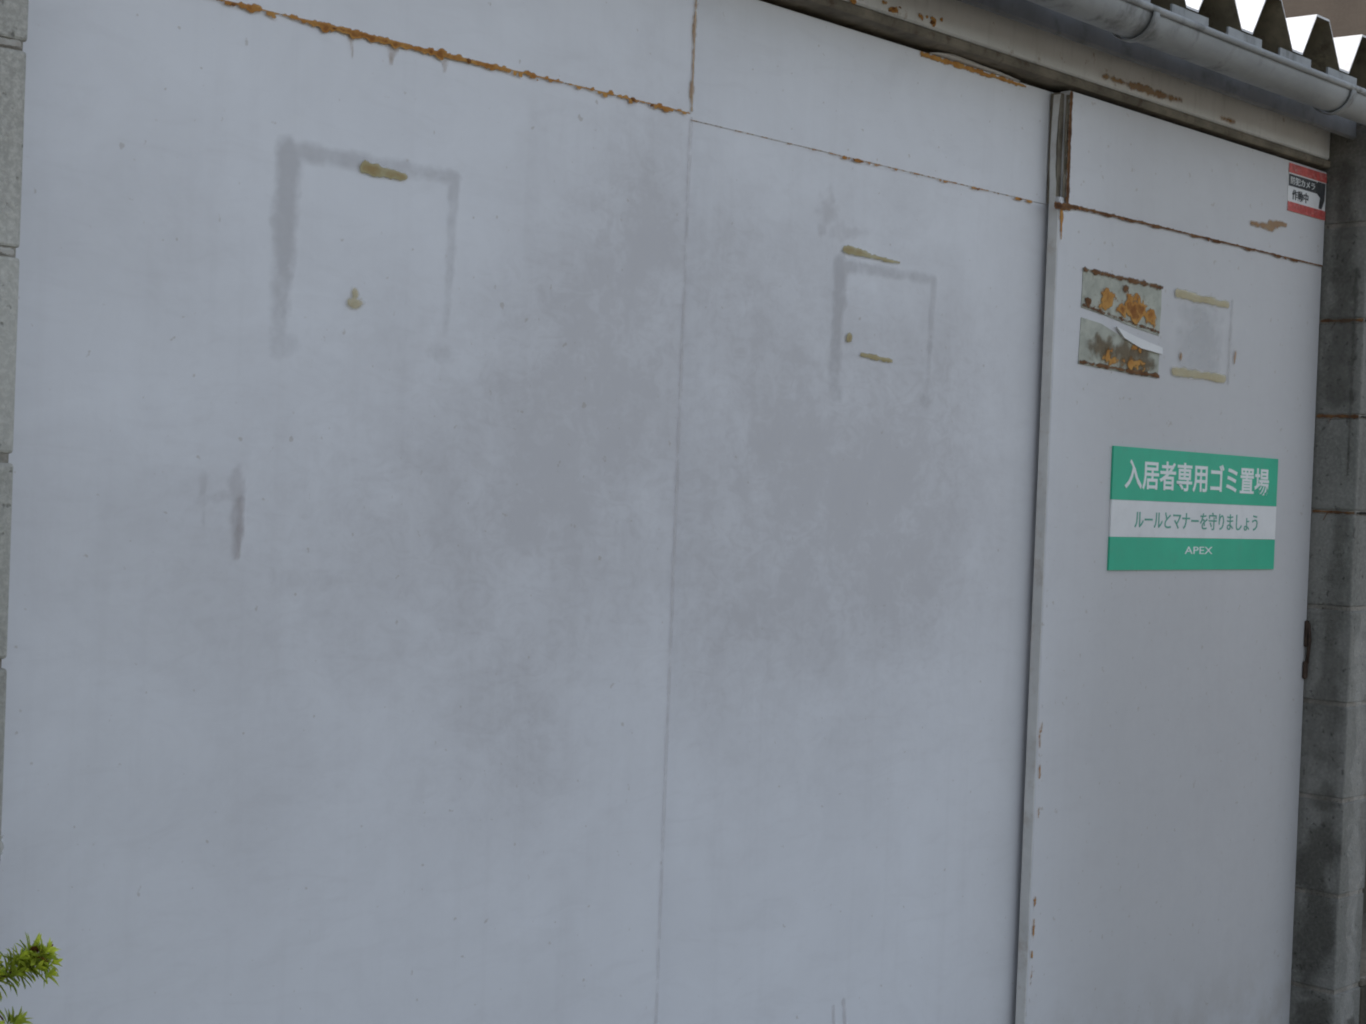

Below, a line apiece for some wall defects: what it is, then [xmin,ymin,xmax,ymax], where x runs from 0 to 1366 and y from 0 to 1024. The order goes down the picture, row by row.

rust [220,0,706,124]
rust [1102,74,1182,102]
rust [812,149,1032,203]
rust [1054,91,1323,267]